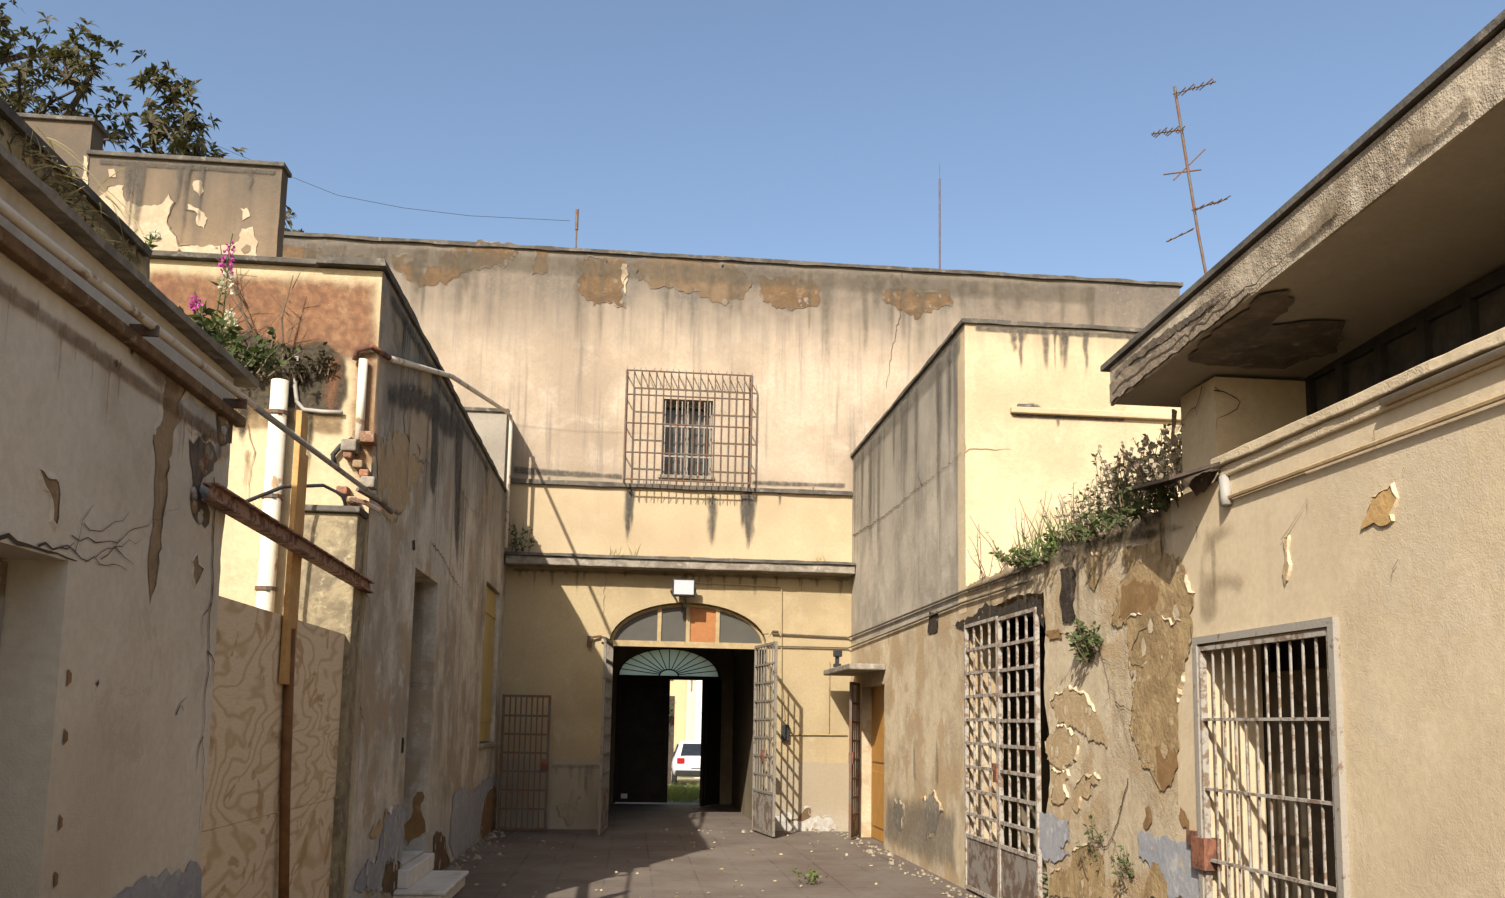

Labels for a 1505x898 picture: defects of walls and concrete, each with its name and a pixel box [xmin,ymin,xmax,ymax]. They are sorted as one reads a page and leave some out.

peeling [82,155,258,256]
leakage [976,326,1136,365]
crack [0,506,177,570]
peeling [148,374,233,604]
peeling [336,383,432,523]
leakage [708,494,716,539]
peeling [1360,482,1400,530]
flaking render [927,539,1101,640]
peeling [1111,540,1195,791]
peeling [1039,684,1120,898]
peeling [113,860,202,898]
peeling [1137,806,1199,898]